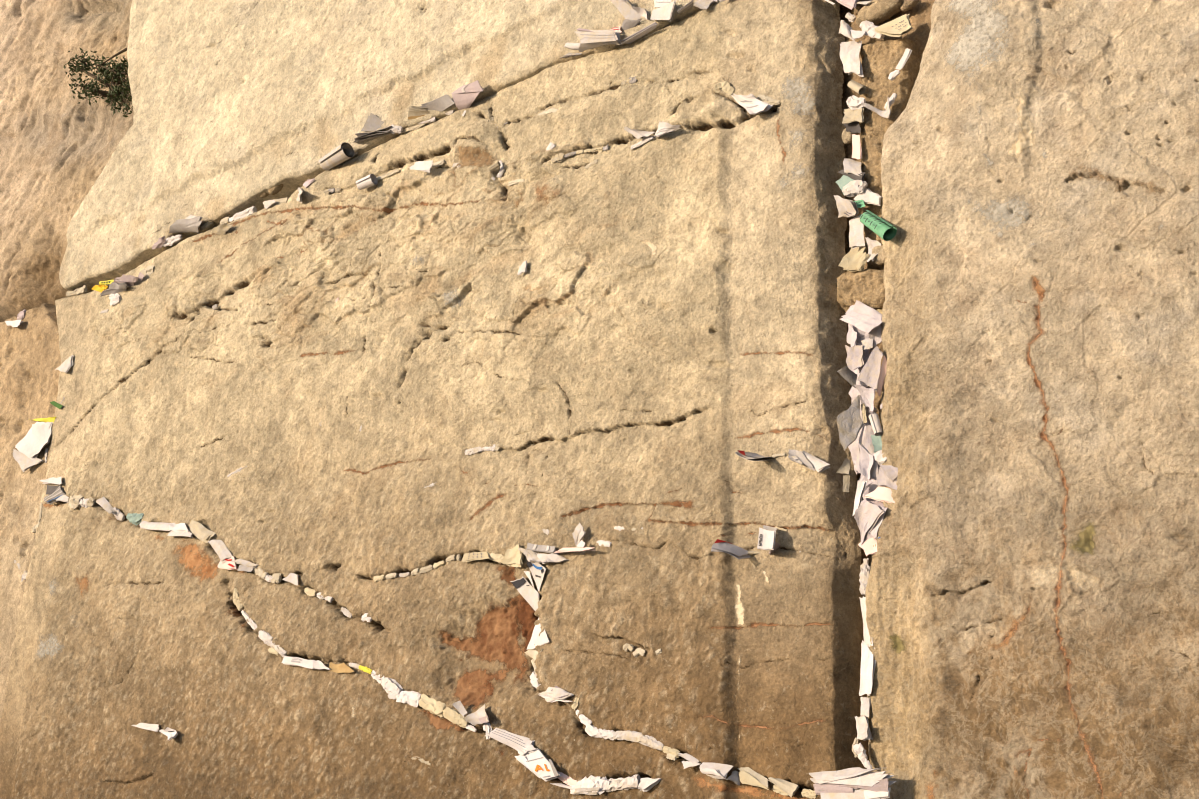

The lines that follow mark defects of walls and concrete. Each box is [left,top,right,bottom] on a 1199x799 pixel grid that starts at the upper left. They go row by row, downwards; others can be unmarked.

crack [602,409,700,433]
crack [344,459,430,474]
crack [462,437,554,520]
crack [965,277,1125,796]
rust [440,564,539,709]